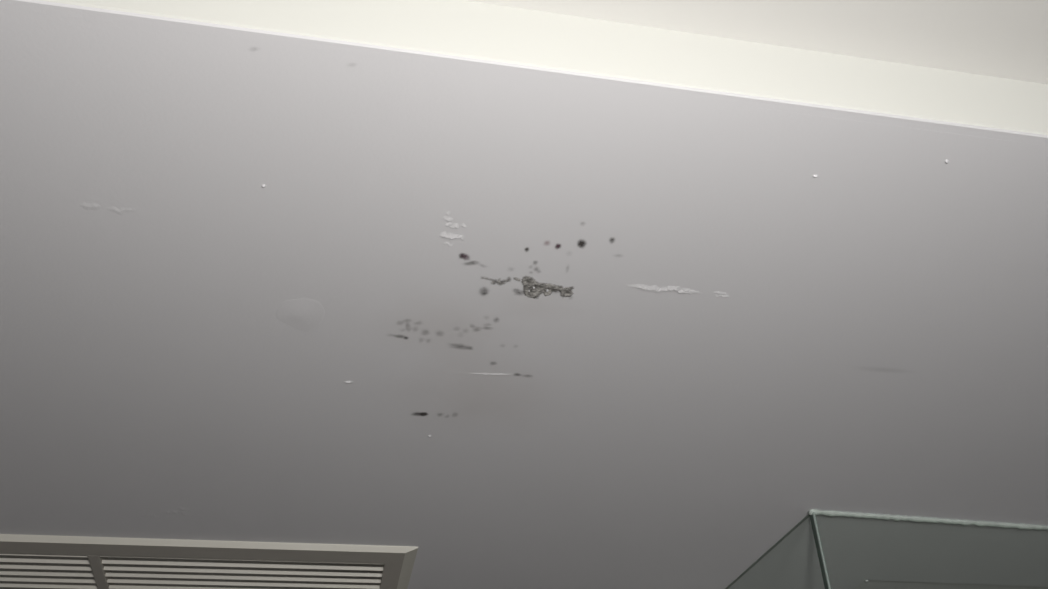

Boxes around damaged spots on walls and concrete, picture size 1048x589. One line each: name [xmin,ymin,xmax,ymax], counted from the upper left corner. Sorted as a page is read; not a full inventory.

spalling [485,276,573,298]